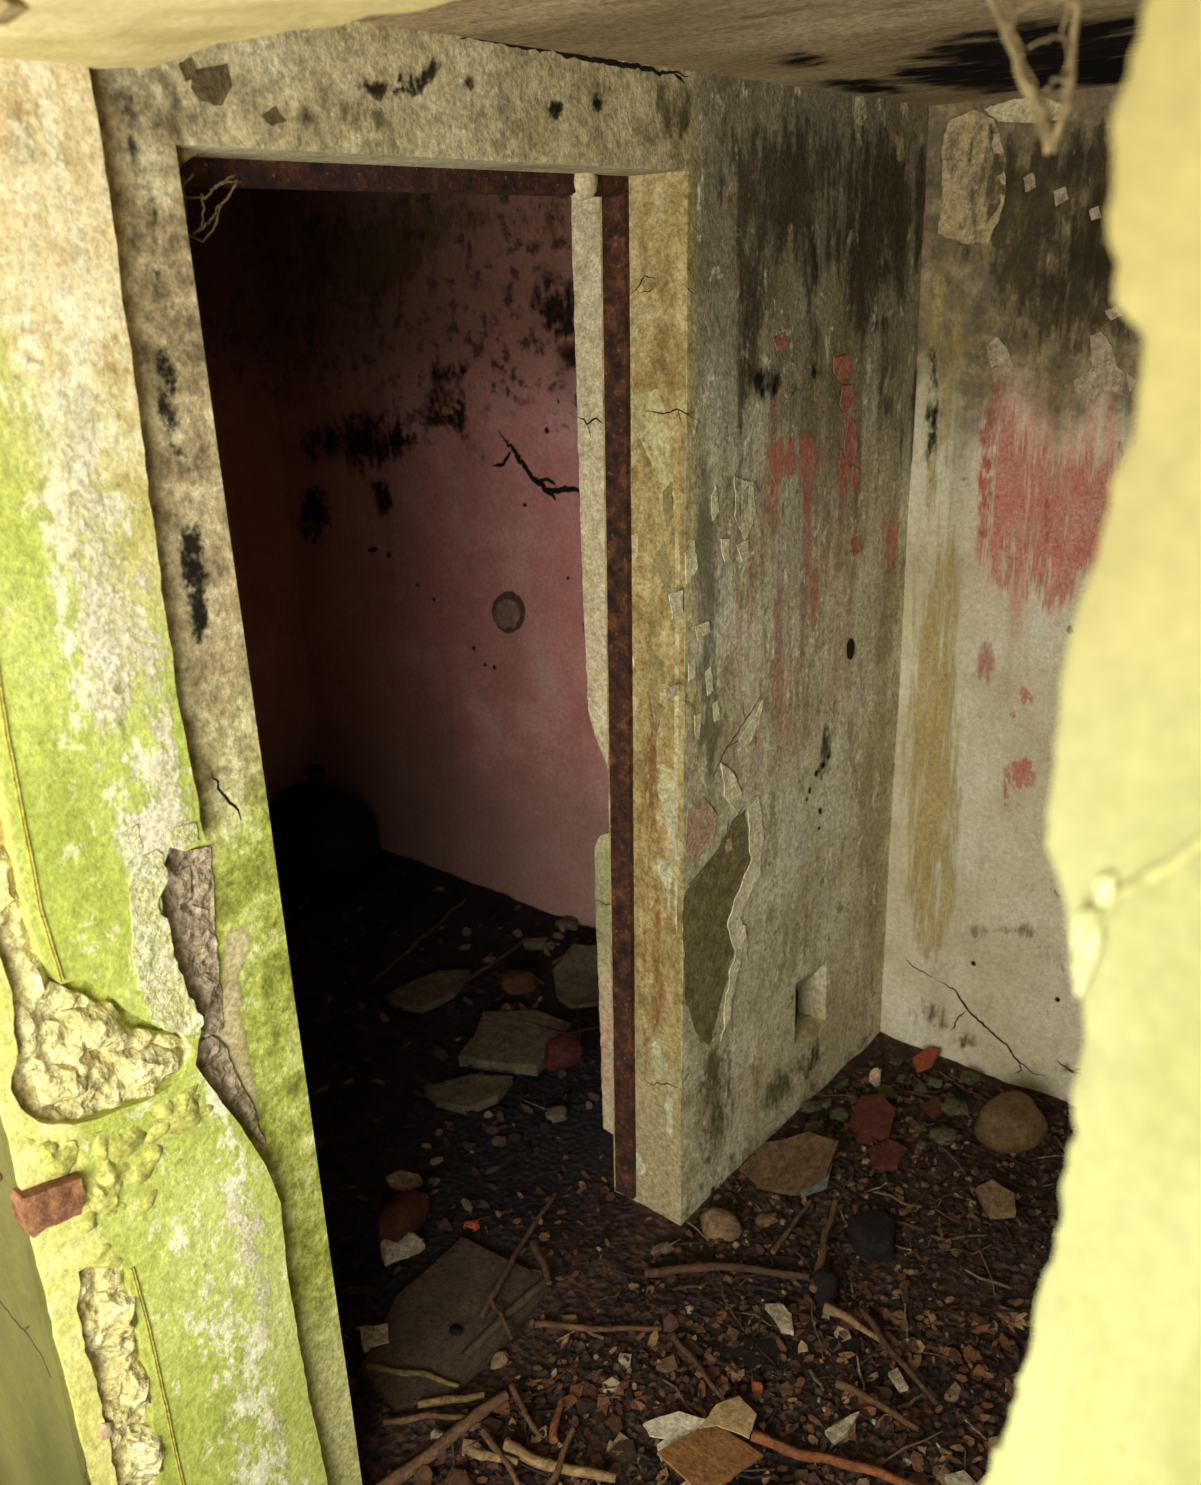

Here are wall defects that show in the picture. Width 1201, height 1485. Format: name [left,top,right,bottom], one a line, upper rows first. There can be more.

peeling [938,97,1061,245]
damp [156,349,183,456]
damp [534,277,576,367]
damp [720,115,925,433]
peeling [1074,306,1137,405]
crack [492,430,580,500]
damp [180,526,208,645]
spalling [0,374,265,1144]
peeling [682,763,764,1046]
crack [1077,837,1201,953]
crack [904,957,1078,1076]
spalling [76,1266,164,1485]